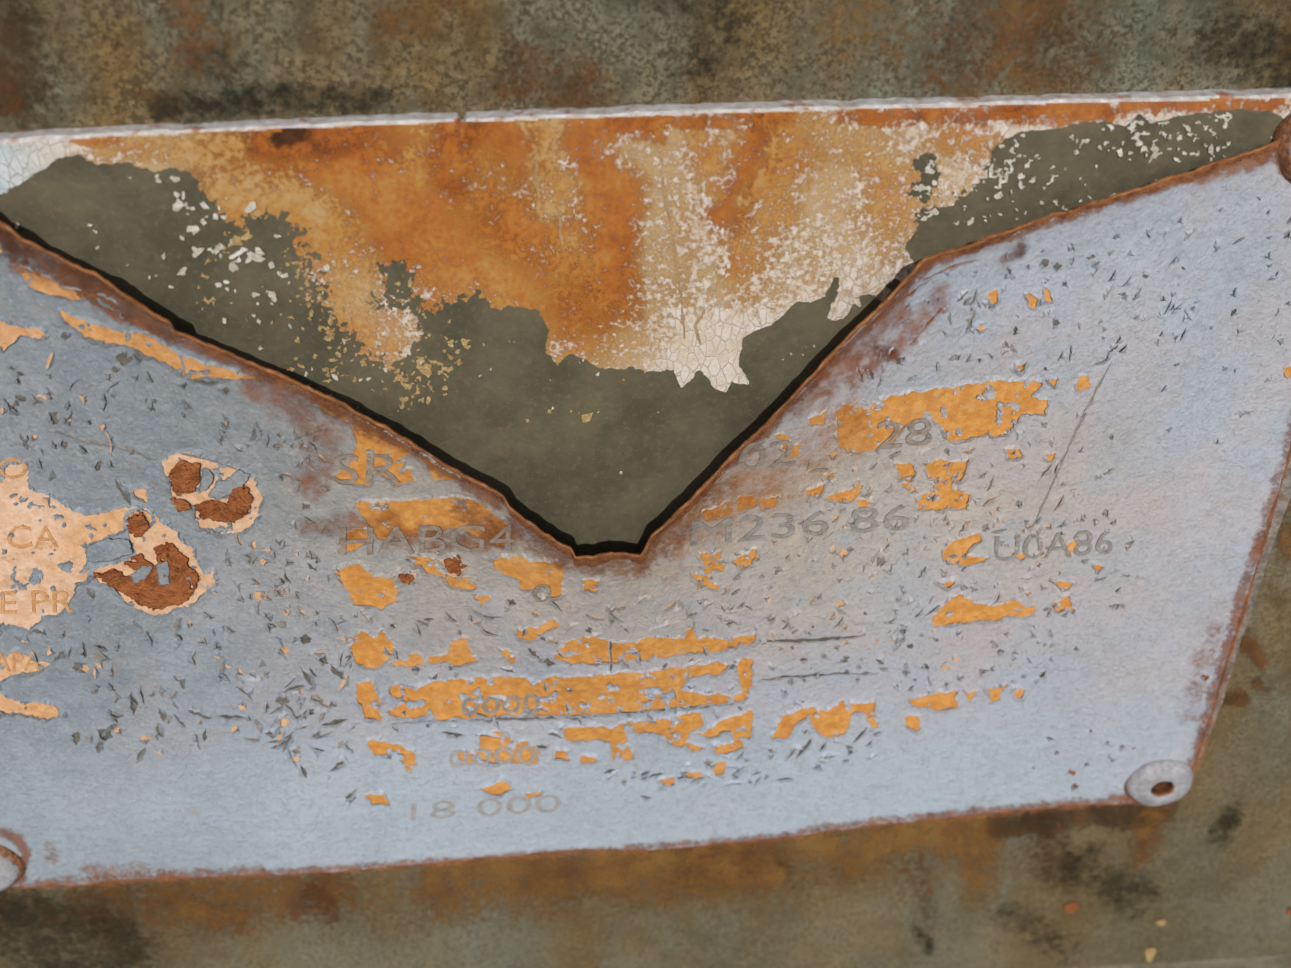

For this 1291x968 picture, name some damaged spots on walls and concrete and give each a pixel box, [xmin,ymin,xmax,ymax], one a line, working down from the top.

spalling [1264,216,1291,282]
corrosion [0,98,1291,581]
peeling [1264,363,1291,383]
peeling [0,109,1284,802]
corrosion [85,447,266,619]
corrosion [393,568,420,587]
peeling [345,789,391,807]
corrosion [0,794,1178,945]